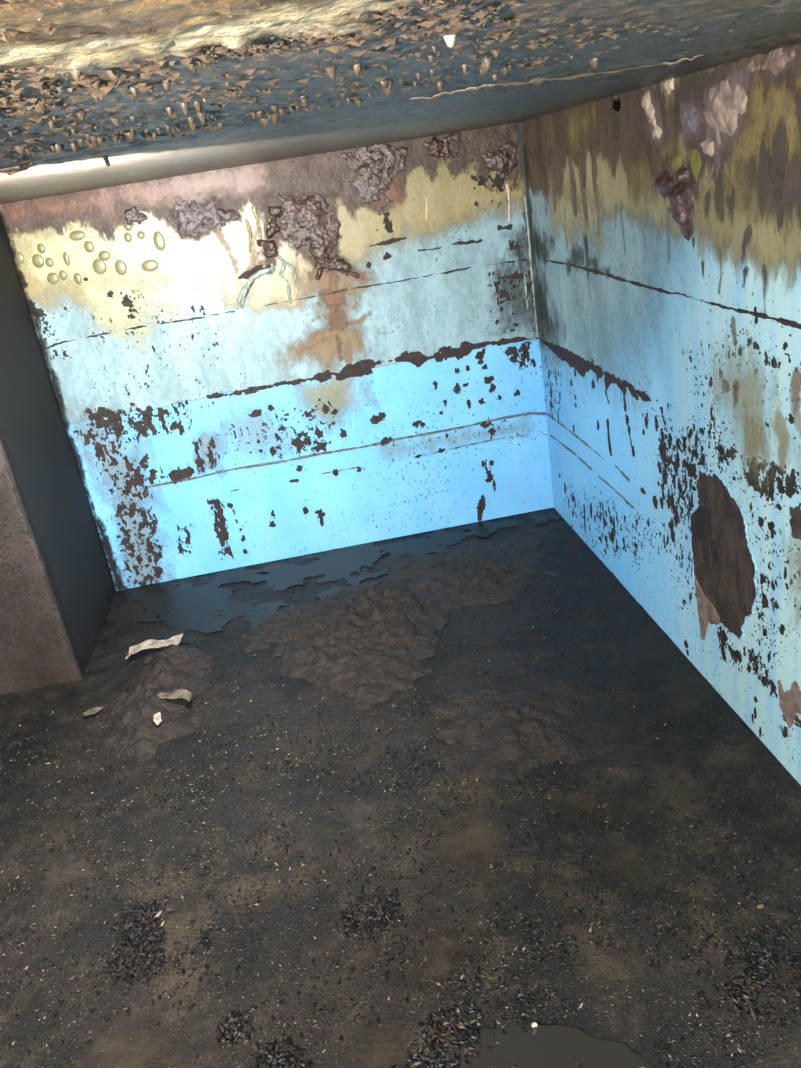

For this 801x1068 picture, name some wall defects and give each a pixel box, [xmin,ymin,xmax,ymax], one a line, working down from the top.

damp [0,0,391,70]
damp [626,44,801,295]
corrosion [216,230,263,275]
peeling [28,300,71,366]
corrosion [288,266,373,416]
damp [0,122,671,590]
peeling [370,412,387,424]
peeling [559,312,801,738]